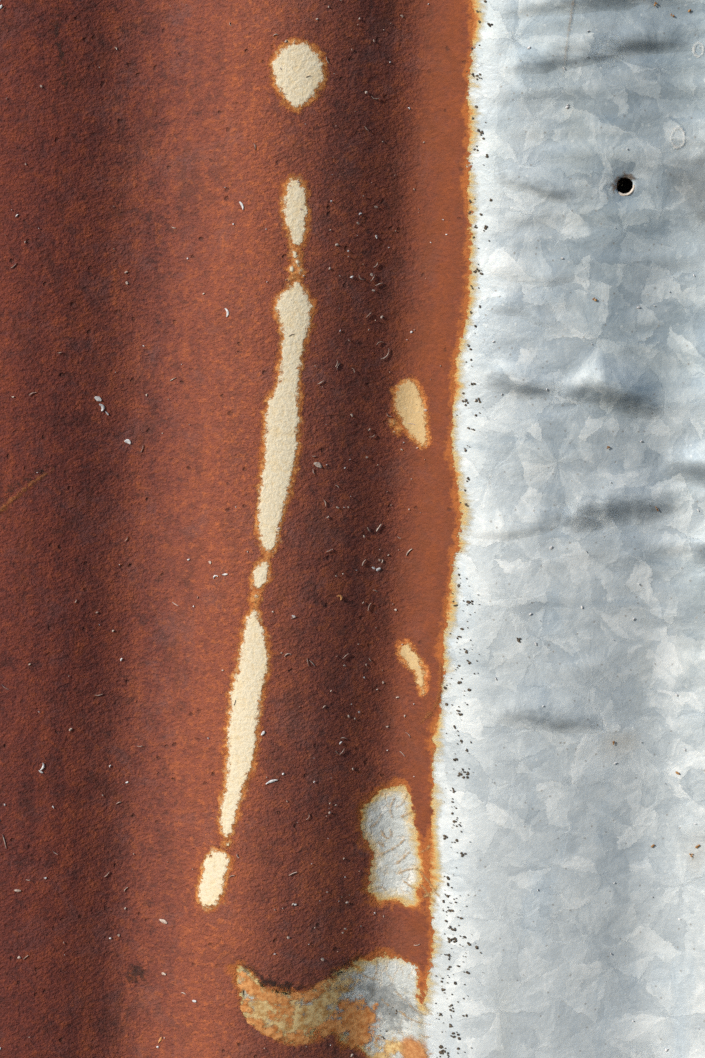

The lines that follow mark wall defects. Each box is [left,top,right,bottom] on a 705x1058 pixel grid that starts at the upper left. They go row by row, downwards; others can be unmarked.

rust [0,0,484,1058]
peeling [237,787,481,1058]